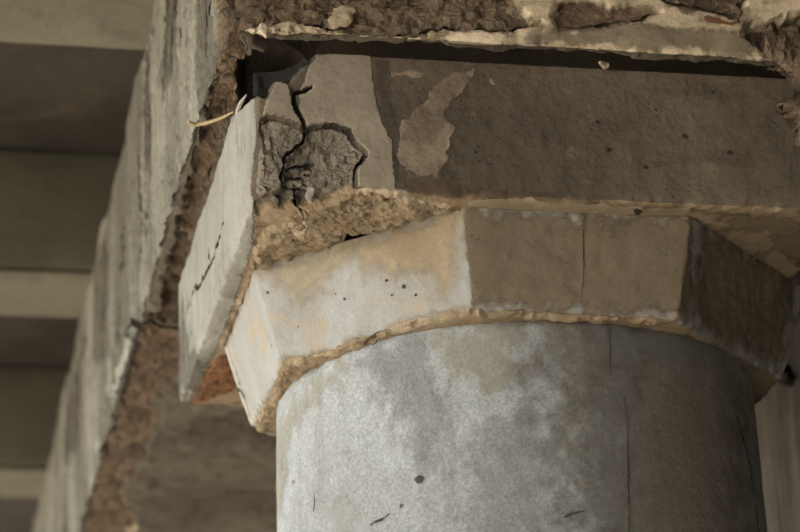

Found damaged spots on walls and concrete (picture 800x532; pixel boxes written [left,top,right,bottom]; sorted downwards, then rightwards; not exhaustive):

crack [164,0,182,47]
flaking render [555,2,648,28]
flaking render [665,0,742,18]
flaking render [749,19,800,148]
crack [119,155,149,276]
crack [118,298,179,337]
crack [190,223,224,306]
crack [273,87,313,211]
flaking render [150,0,528,318]
rust [192,187,691,403]
spalling [81,324,180,532]
peeling [224,346,256,428]